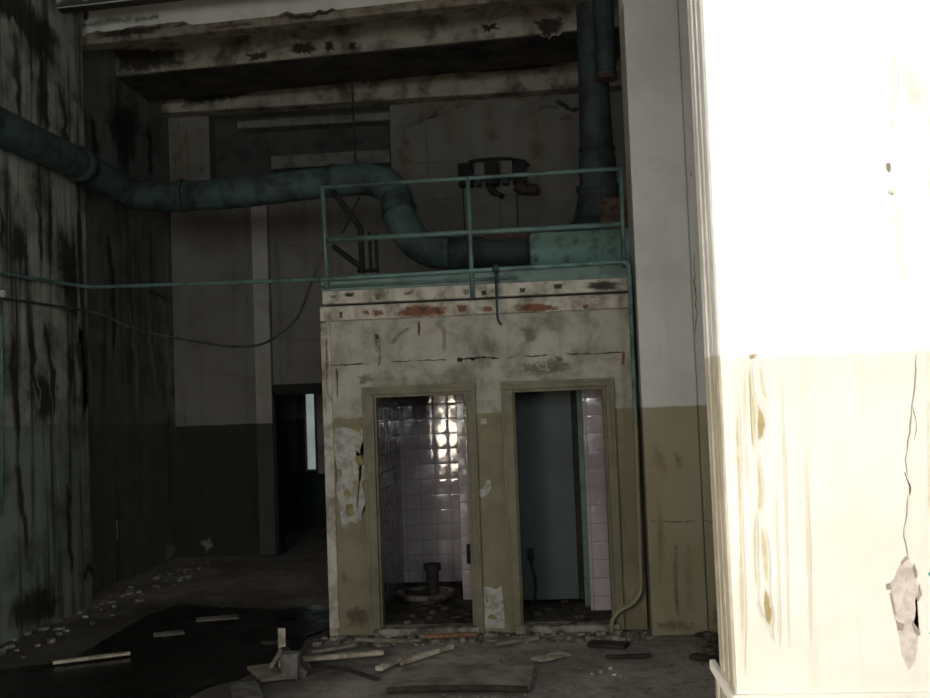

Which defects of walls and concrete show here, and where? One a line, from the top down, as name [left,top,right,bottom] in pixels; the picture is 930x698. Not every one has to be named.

leakage [0,0,71,142]
leakage [56,0,195,75]
leakage [182,92,254,108]
leakage [0,185,91,450]
corrosion [360,304,467,337]
leakage [2,461,67,634]
leakage [63,477,99,587]
peeling [334,426,365,529]
leakage [735,353,789,674]
crack [903,353,917,557]
peeling [886,556,930,670]